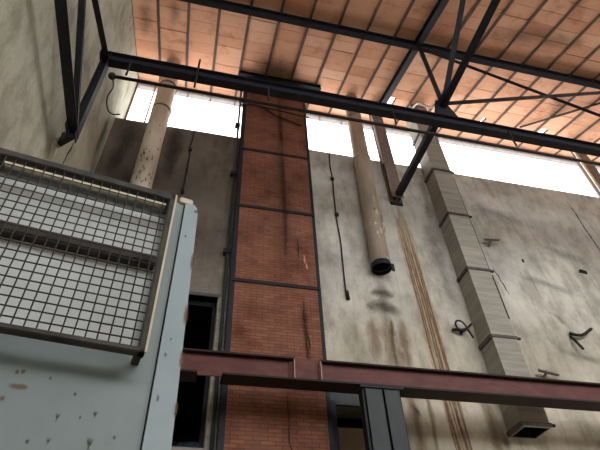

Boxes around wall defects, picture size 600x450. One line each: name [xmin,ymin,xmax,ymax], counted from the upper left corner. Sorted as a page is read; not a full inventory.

rust [398,215,449,370]
crack [302,294,311,358]
rust [443,400,470,450]